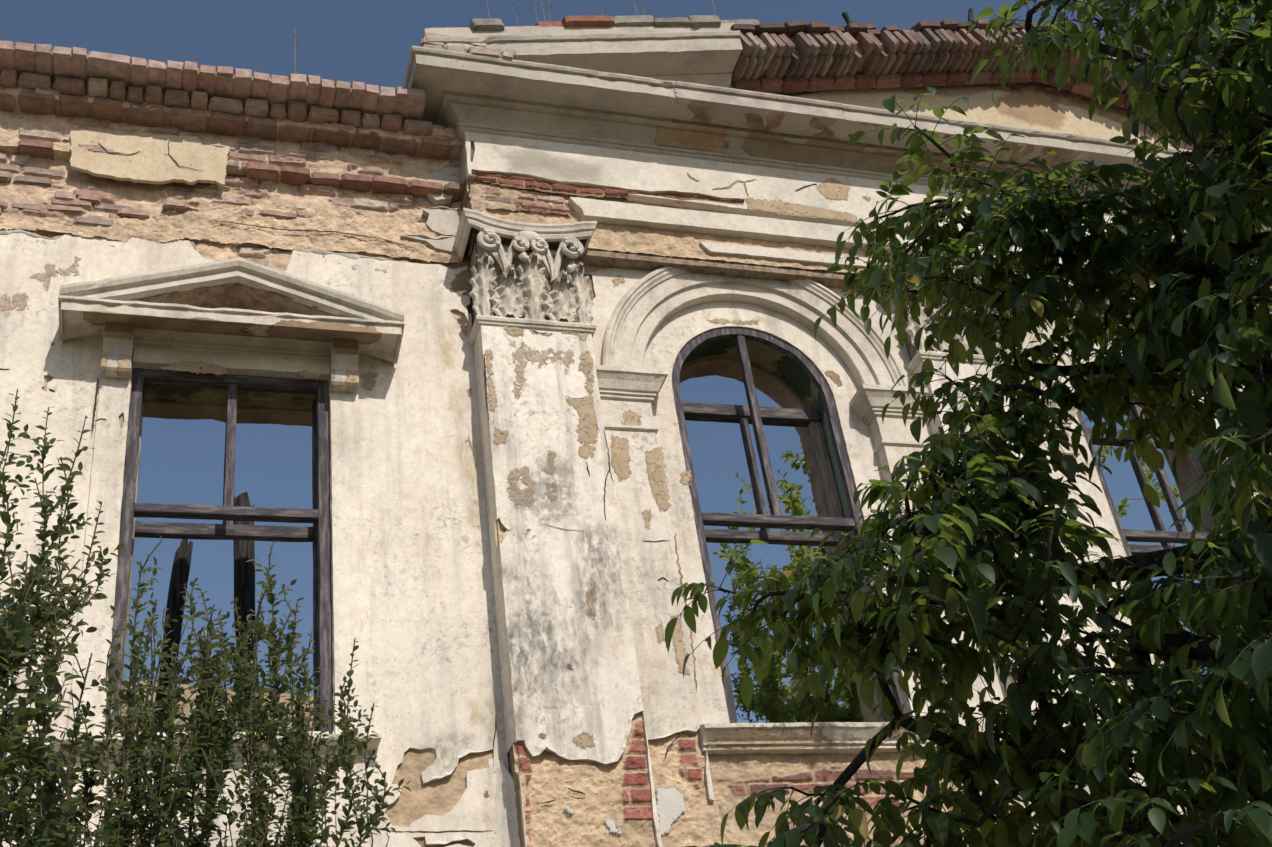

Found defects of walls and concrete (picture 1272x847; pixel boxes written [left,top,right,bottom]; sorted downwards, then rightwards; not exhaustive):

flaking render [654,81,967,159]
flaking render [979,138,1081,173]
flaking render [0,82,870,337]
peeling [485,349,498,411]
peeling [494,427,508,445]
peeling [502,326,692,529]
water stain [519,601,577,668]
flaking render [385,748,494,847]
flaking render [513,712,864,847]